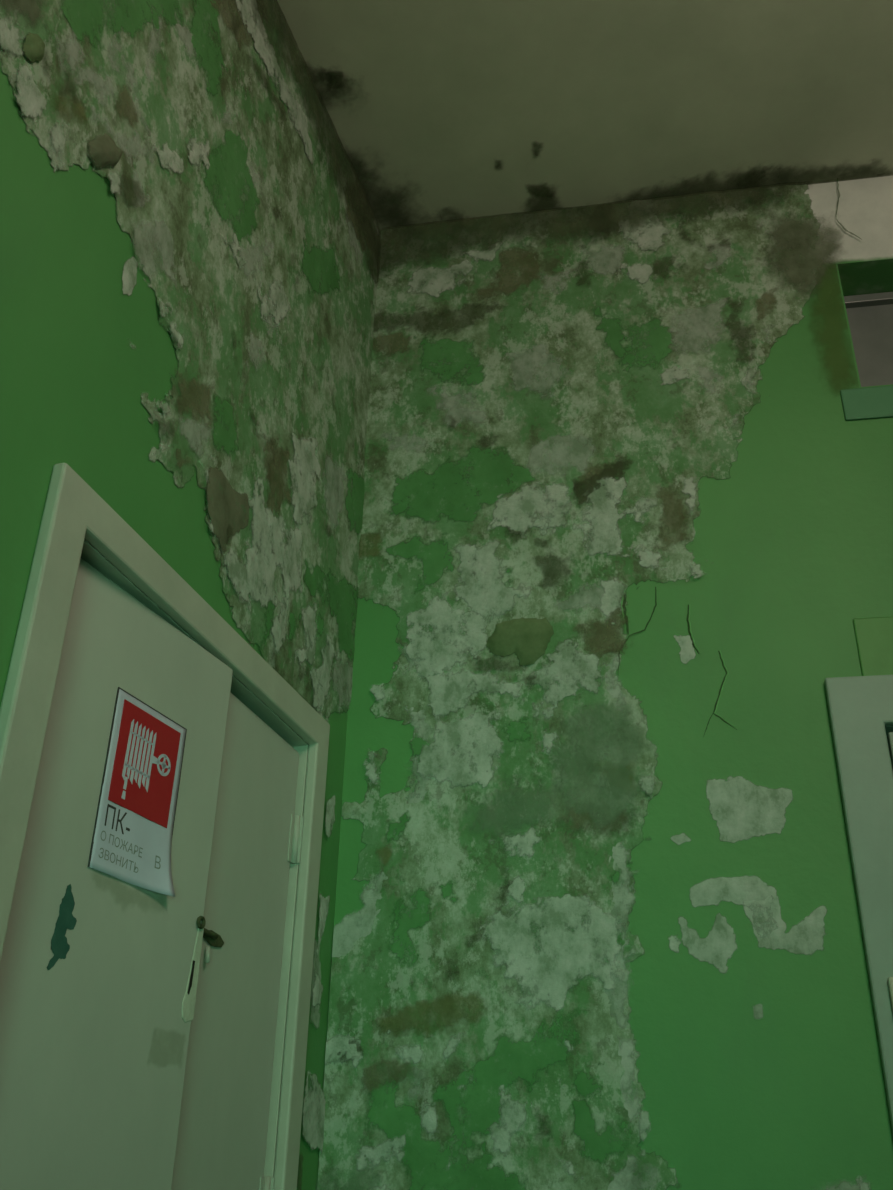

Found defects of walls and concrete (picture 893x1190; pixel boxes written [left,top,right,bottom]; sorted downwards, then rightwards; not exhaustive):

damp [257,0,890,269]
peeling [0,0,379,721]
peeling [302,184,827,1190]
crack [618,587,657,670]
crack [686,605,738,737]